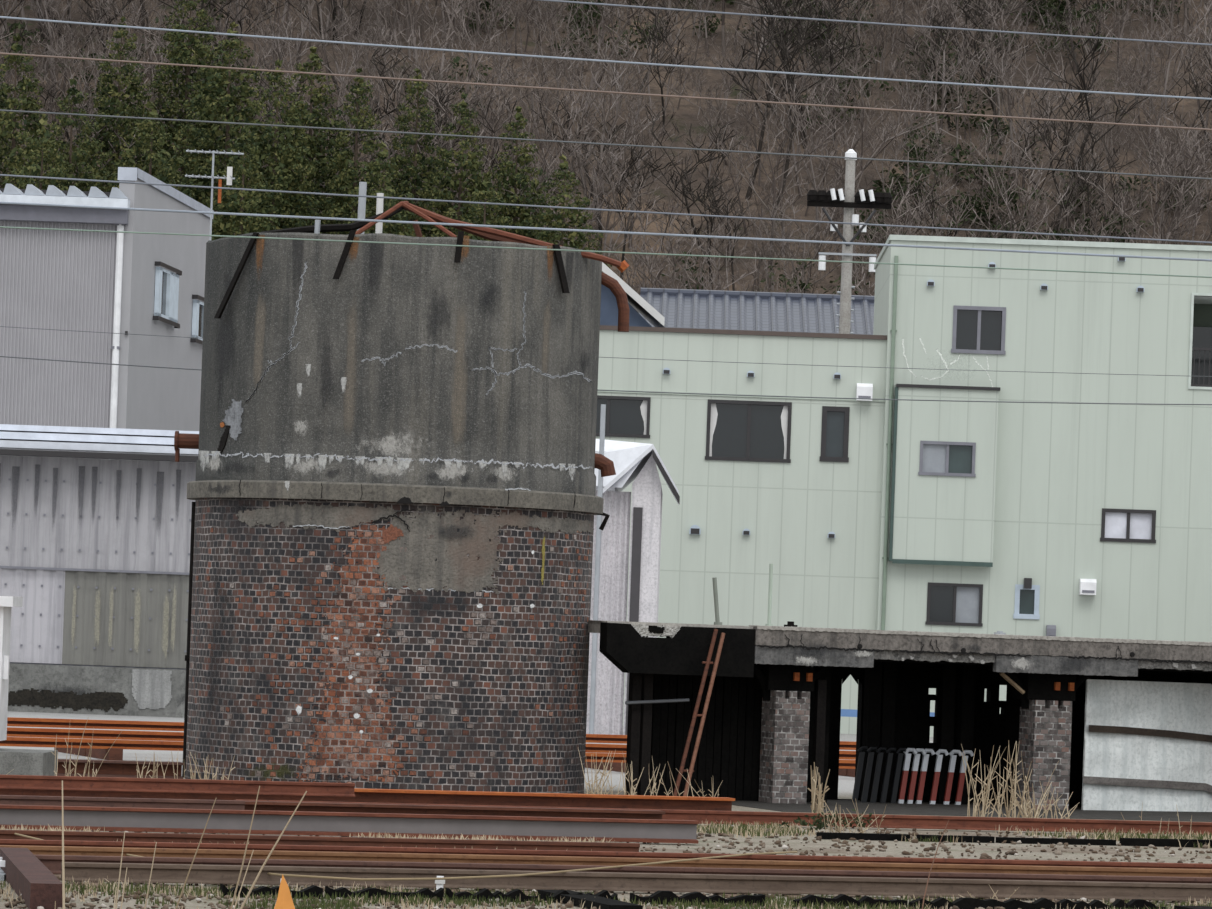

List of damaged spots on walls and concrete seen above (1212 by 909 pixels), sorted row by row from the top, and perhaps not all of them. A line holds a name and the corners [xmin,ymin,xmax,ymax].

crack [246,259,307,402]
crack [361,291,592,396]
spalling [217,399,244,456]
leakage [199,432,587,490]
spalling [240,522,433,785]